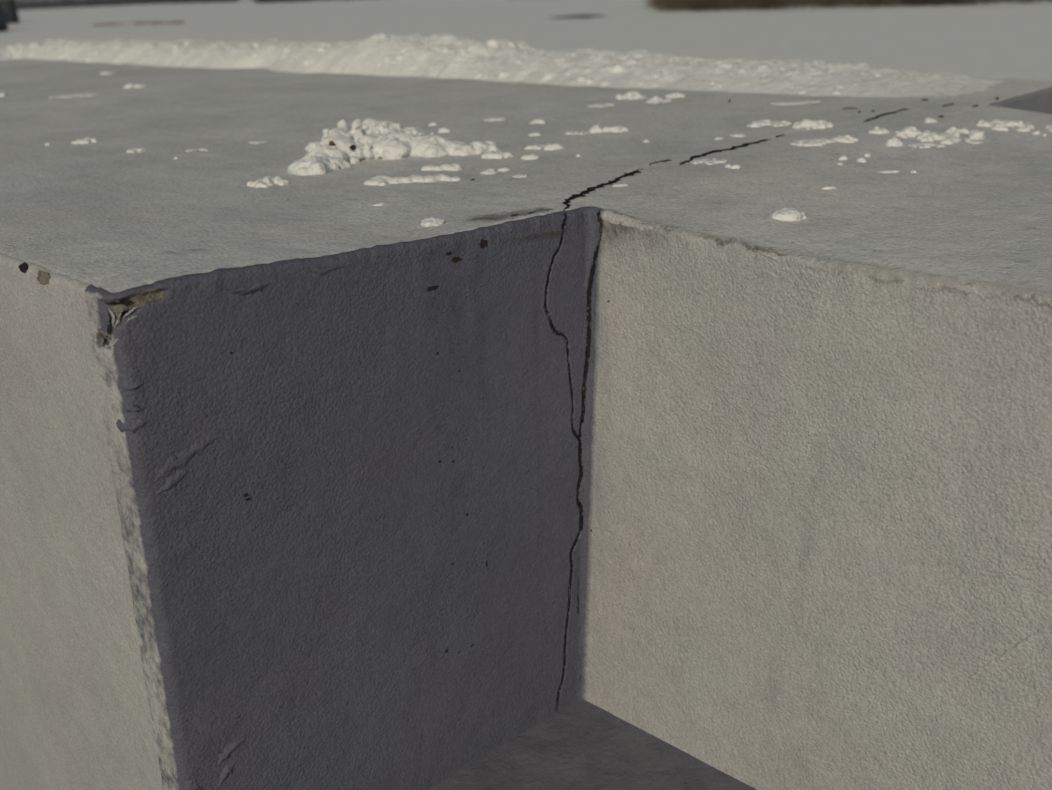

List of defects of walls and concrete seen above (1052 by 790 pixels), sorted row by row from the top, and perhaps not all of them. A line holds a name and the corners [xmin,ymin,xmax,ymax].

crack [843,108,908,122]
spalling [97,288,165,349]
crack [544,134,784,712]